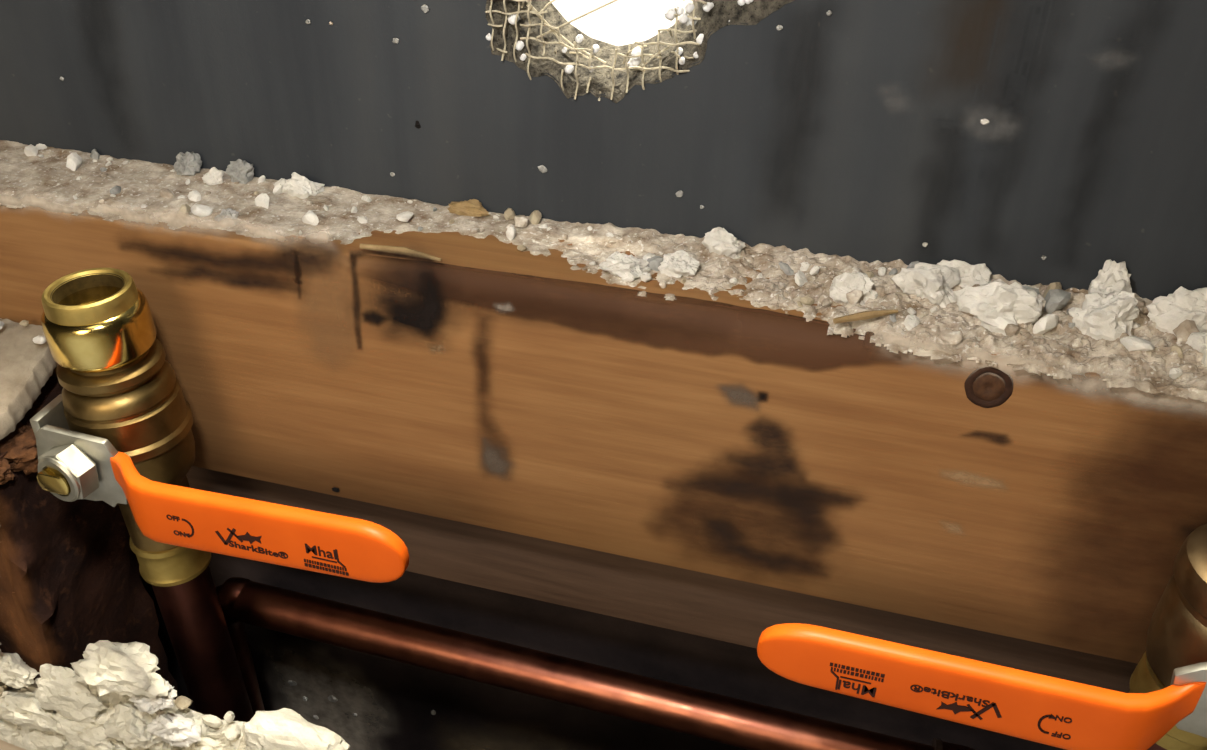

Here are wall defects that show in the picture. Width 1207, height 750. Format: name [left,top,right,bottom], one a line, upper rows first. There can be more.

spalling [485,0,794,103]
leakage [363,267,444,335]
leakage [722,387,767,407]
leakage [665,423,849,569]
flaking render [0,574,246,750]
spalling [209,552,1065,750]